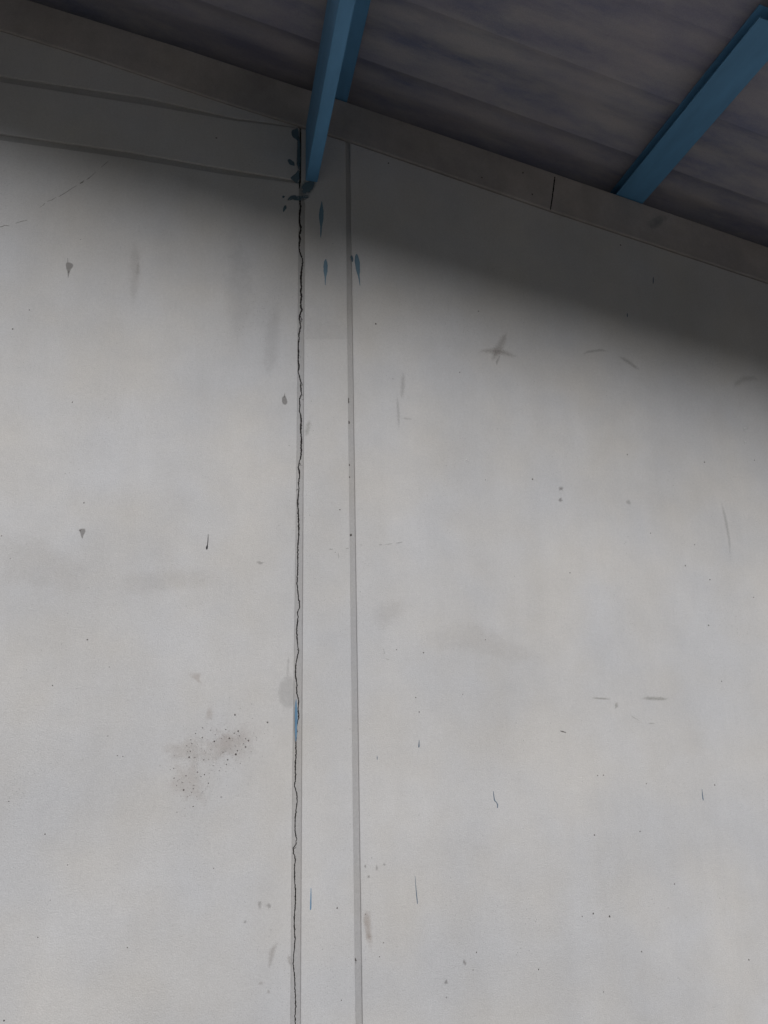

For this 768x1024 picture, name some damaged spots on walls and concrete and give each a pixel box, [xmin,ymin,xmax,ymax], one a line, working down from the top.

crack [293,128,304,1024]